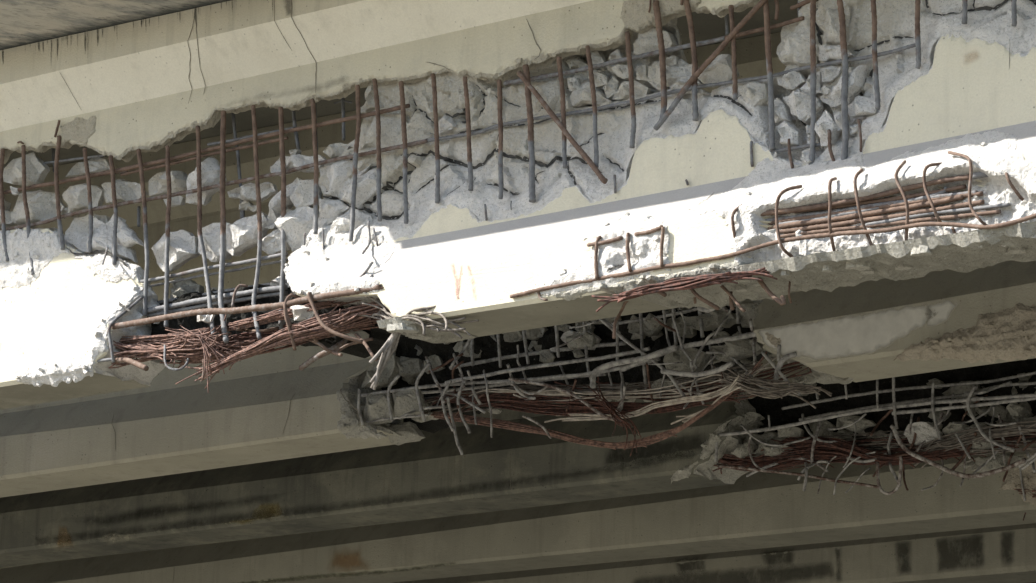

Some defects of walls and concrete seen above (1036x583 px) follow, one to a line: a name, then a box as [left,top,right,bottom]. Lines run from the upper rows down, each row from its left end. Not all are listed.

crack [925,0,1036,16]
crack [187,9,206,103]
crack [274,0,317,93]
crack [854,36,914,96]
spalling [60,116,97,145]
spalling [283,0,1036,309]
spalling [0,228,143,387]
spalling [377,316,476,343]
spalling [893,303,1036,363]
spalling [336,388,391,439]
spalling [670,419,733,483]
spalling [999,451,1036,507]